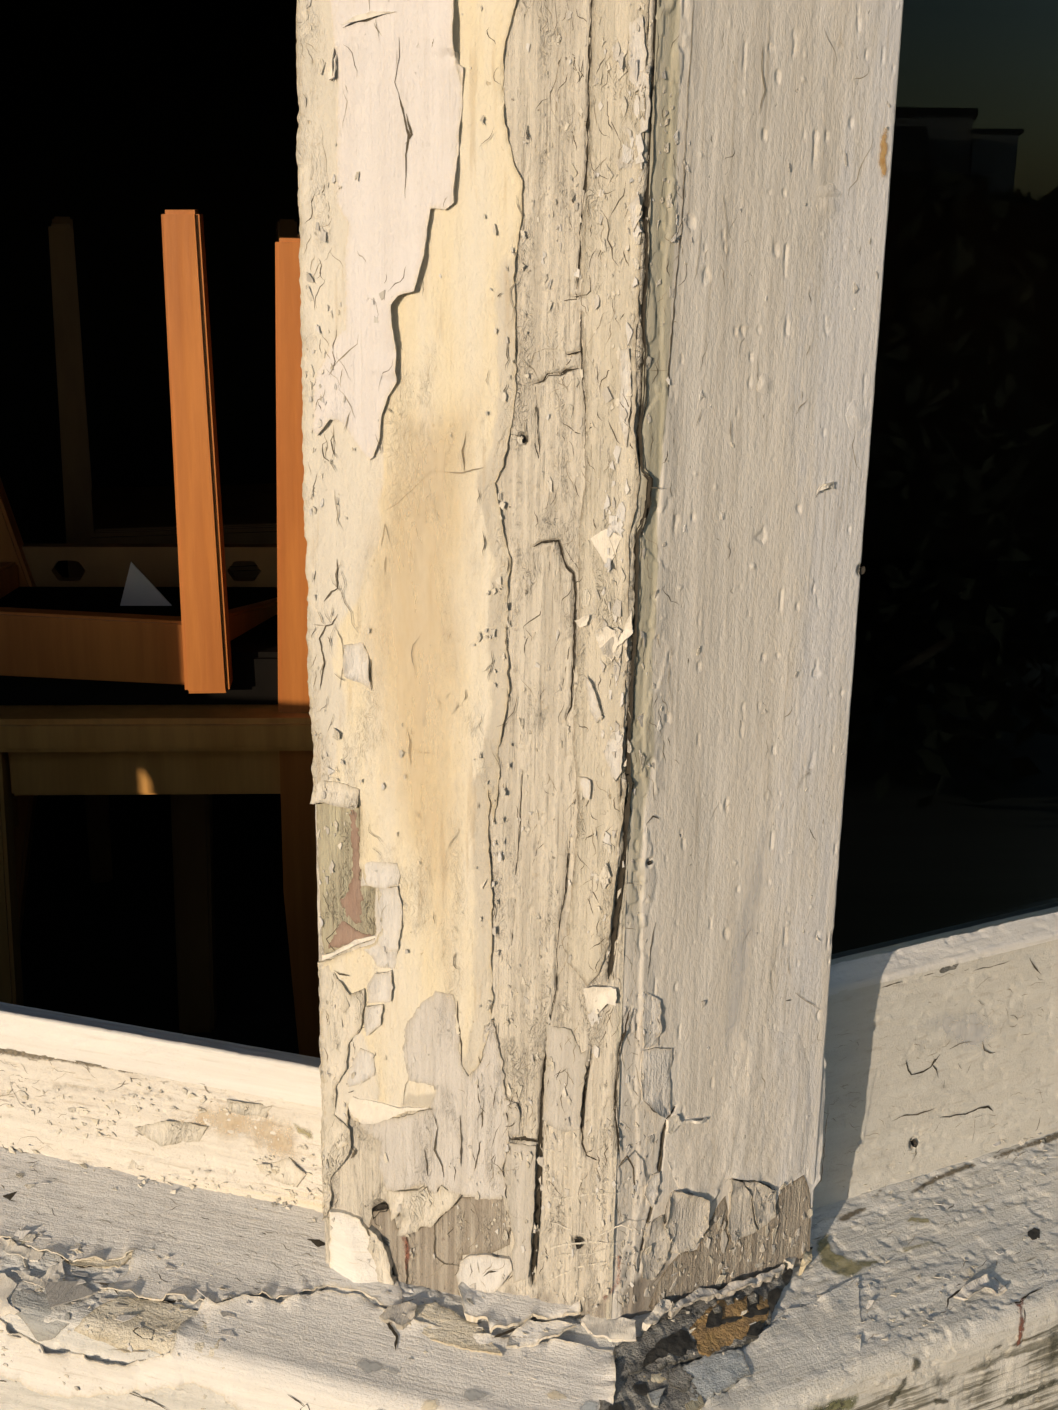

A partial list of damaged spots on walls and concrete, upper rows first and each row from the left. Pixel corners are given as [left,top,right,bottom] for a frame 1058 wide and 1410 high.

crack [0,0,804,1324]
crack [786,958,1057,1286]
crack [870,1251,1048,1338]